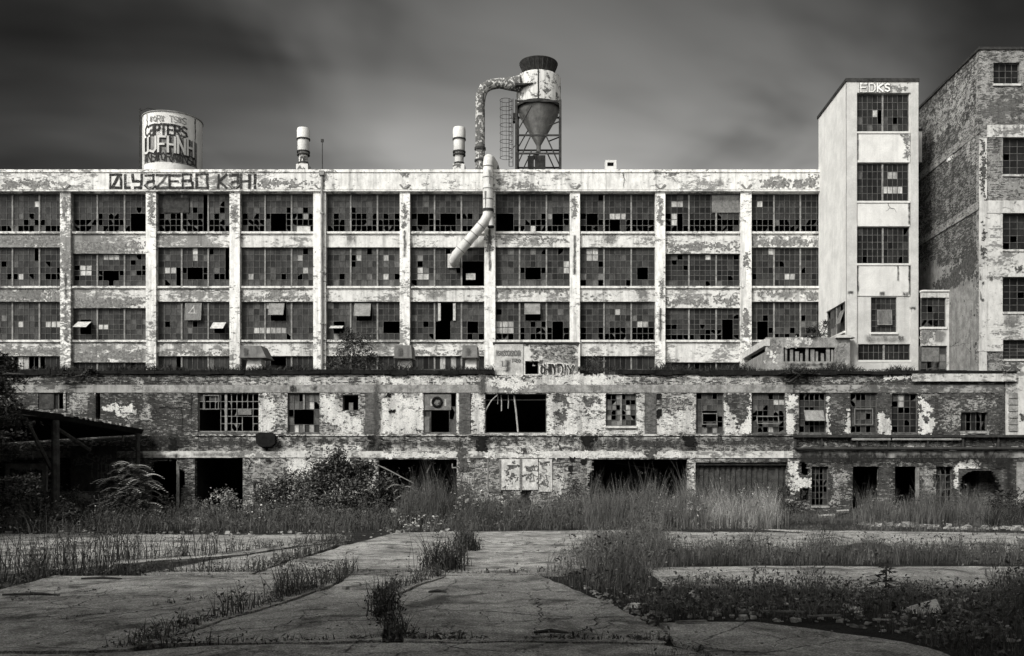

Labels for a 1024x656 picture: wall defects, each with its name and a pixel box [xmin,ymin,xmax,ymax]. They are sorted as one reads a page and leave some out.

peeling [900,57,1024,200]
peeling [1,178,57,190]
peeling [257,178,314,190]
peeling [496,179,539,190]
spalling [932,221,988,290]
peeling [918,325,938,345]
peeling [102,342,1005,497]